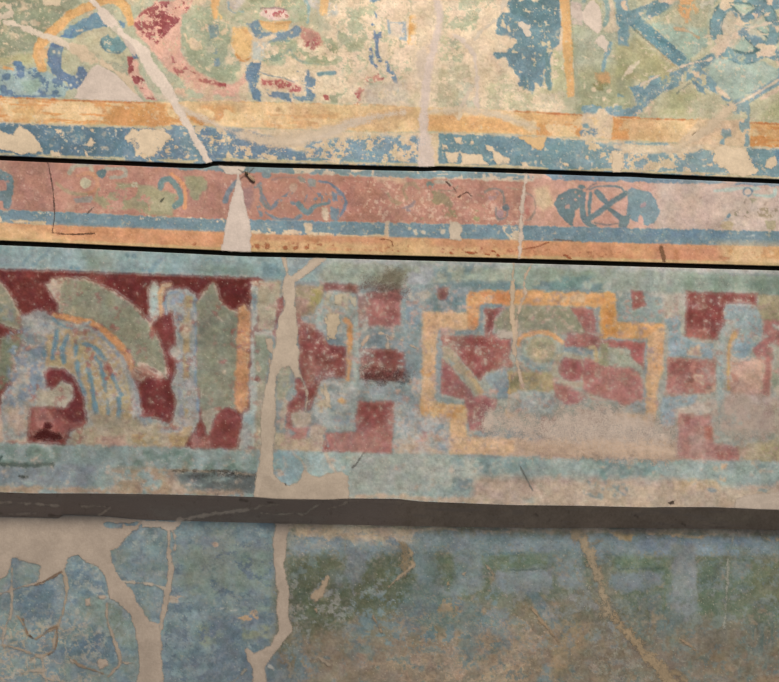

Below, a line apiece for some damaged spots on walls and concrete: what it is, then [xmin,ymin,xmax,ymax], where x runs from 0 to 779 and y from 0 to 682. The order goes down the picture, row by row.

crack [0,2,73,53]
spalling [570,0,609,53]
crack [89,0,541,198]
peeling [0,125,62,157]
peeling [125,127,171,158]
peeling [442,137,510,166]
peeling [611,150,624,172]
peeling [713,145,777,178]
crack [47,163,95,236]
crack [123,257,364,682]
crack [0,567,134,682]
spalling [0,514,181,682]